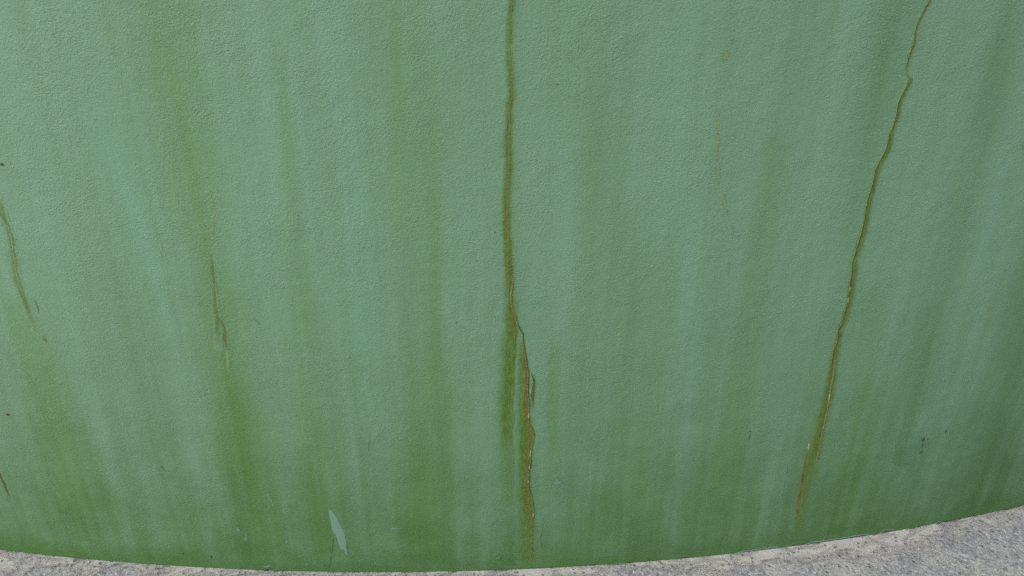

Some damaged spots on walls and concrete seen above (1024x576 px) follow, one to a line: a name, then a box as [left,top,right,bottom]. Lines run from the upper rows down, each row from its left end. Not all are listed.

crack [0,193,42,337]
water stain [0,287,132,555]
crack [210,198,230,373]
water stain [69,0,491,569]
crack [489,0,553,569]
water stain [520,0,1024,561]
crack [782,0,934,541]